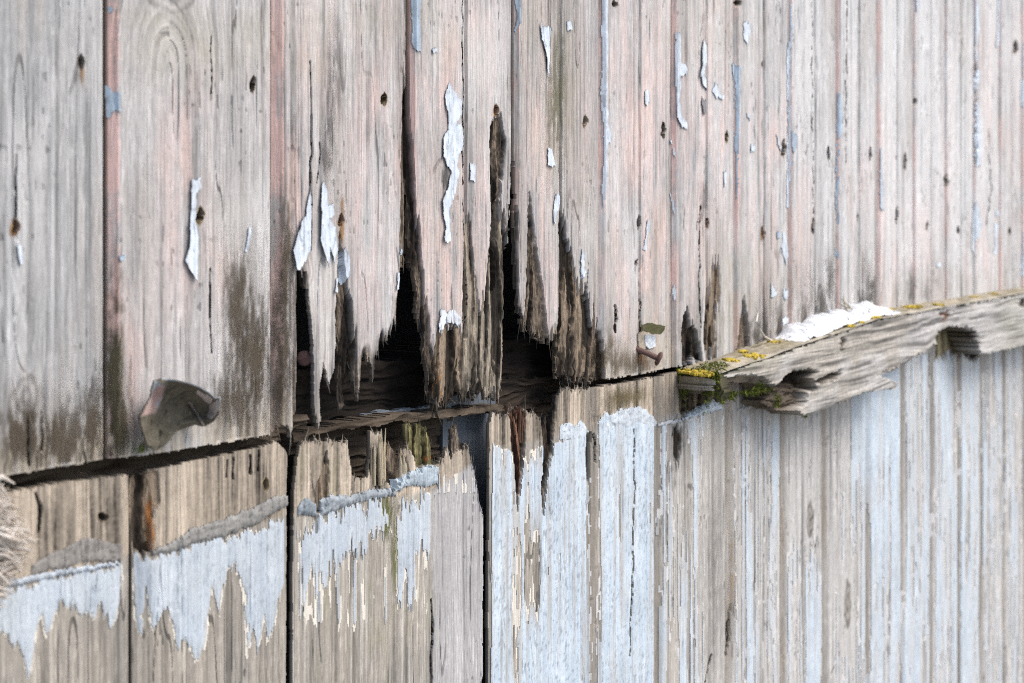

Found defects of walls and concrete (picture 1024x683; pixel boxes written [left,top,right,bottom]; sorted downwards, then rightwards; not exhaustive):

damp [6,331,128,464]
peeling [138,378,221,451]
damp [217,264,290,426]
damp [283,205,292,302]
peeling [293,180,350,293]
peeling [438,308,461,332]
peeling [443,82,476,243]
peeling [547,148,556,168]
peeling [675,32,756,198]
peeling [776,4,797,208]
peeling [0,464,475,682]
peeling [490,399,724,683]